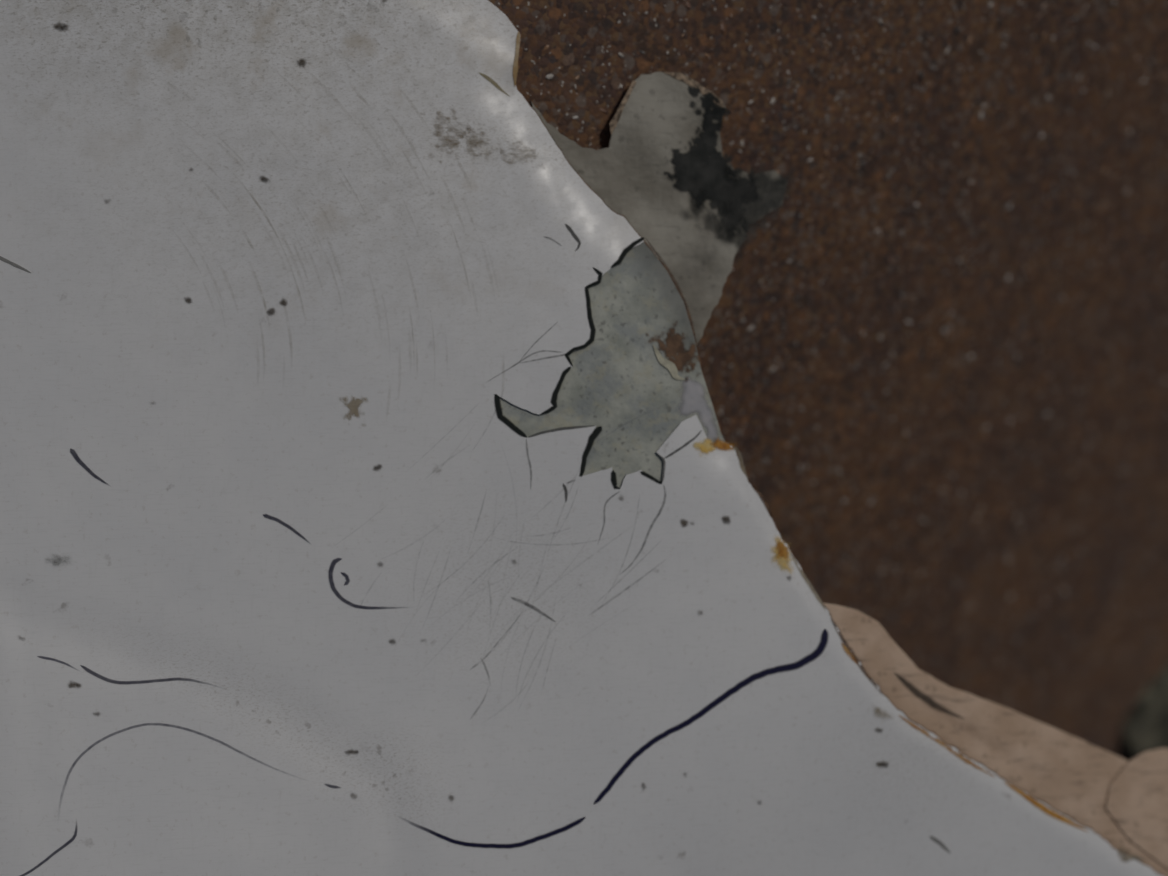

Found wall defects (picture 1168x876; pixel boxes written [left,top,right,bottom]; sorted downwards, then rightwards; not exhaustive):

corrosion [479,31,520,96]
corrosion [609,81,637,134]
corrosion [664,72,725,108]
peeling [665,86,792,246]
peeling [494,237,726,489]
corrosion [694,439,773,518]
corrosion [775,539,882,694]